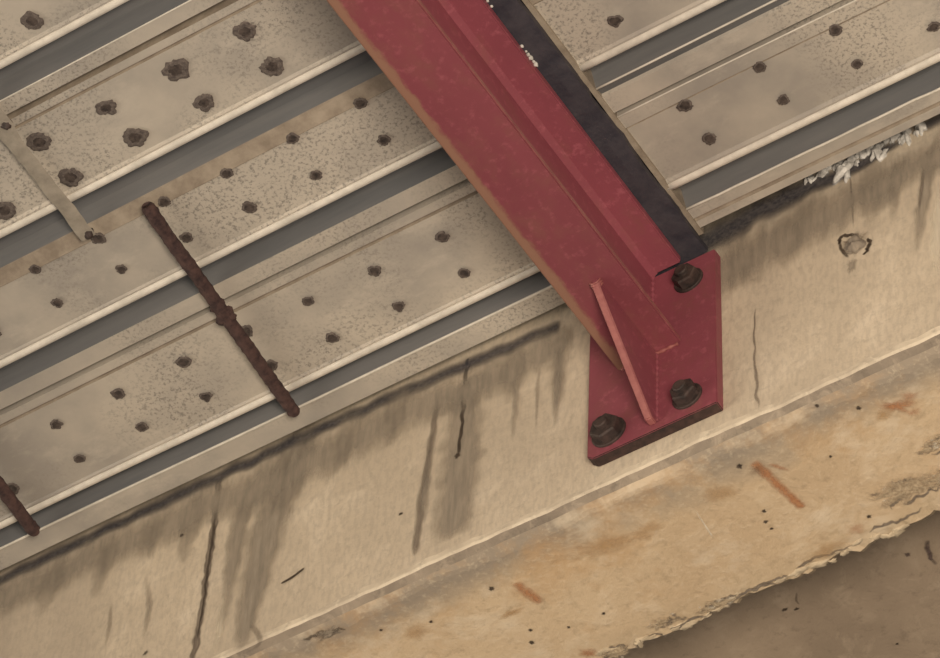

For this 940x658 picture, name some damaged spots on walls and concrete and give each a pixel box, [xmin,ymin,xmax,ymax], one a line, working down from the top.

water stain [925,115,940,128]
water stain [698,142,940,283]
rust [142,201,300,418]
crack [752,316,760,402]
rust [0,476,40,537]
water stain [0,323,568,642]
rust [753,463,803,508]
peeling [869,524,910,540]
spalling [873,471,940,507]
peeling [752,549,849,589]
spalling [595,592,742,658]